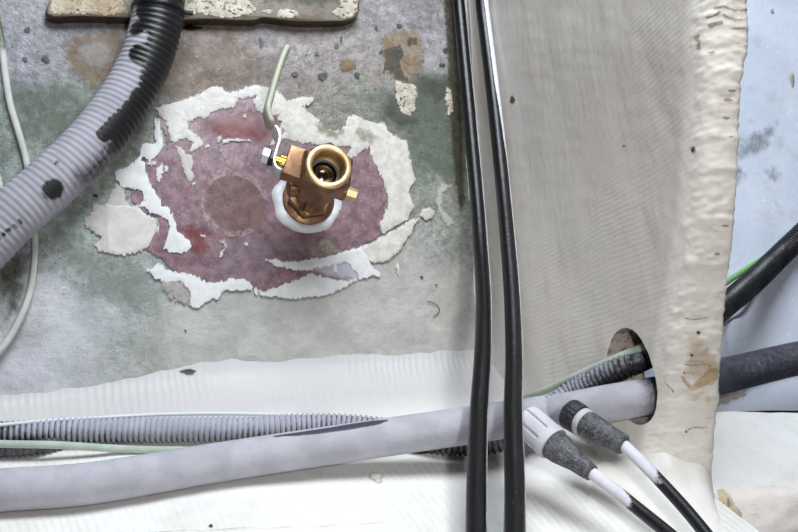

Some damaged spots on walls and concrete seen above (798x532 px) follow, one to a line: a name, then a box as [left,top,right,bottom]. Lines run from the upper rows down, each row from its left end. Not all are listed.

rust [382,29,423,84]
peeling [395,81,417,116]
water stain [743,129,772,153]
rust [682,339,718,390]